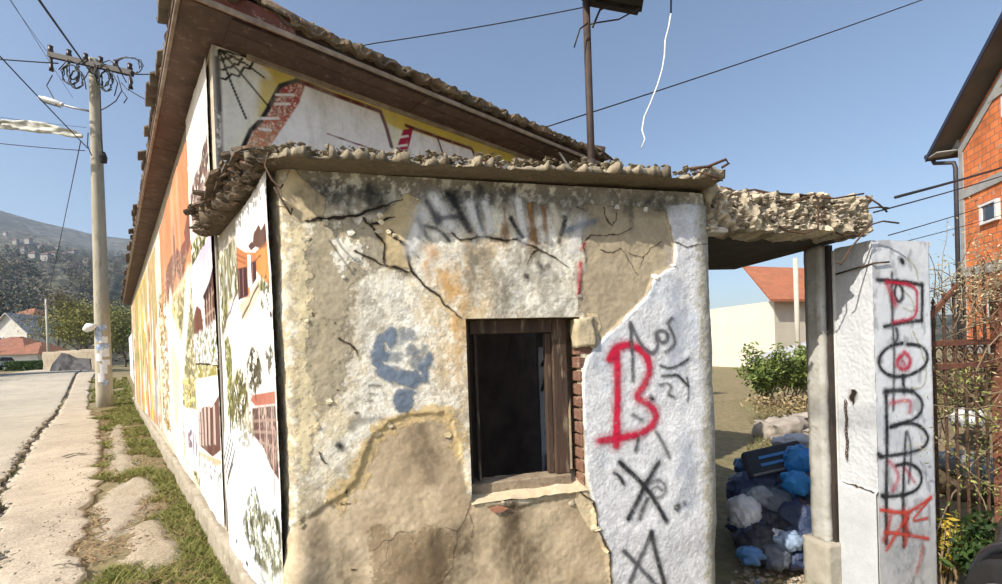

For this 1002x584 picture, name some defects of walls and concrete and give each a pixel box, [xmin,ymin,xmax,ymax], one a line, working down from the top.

flaking render [264,152,423,474]
crack [305,199,461,318]
crack [451,206,708,275]
spalling [690,158,899,265]
flaking render [282,404,611,584]